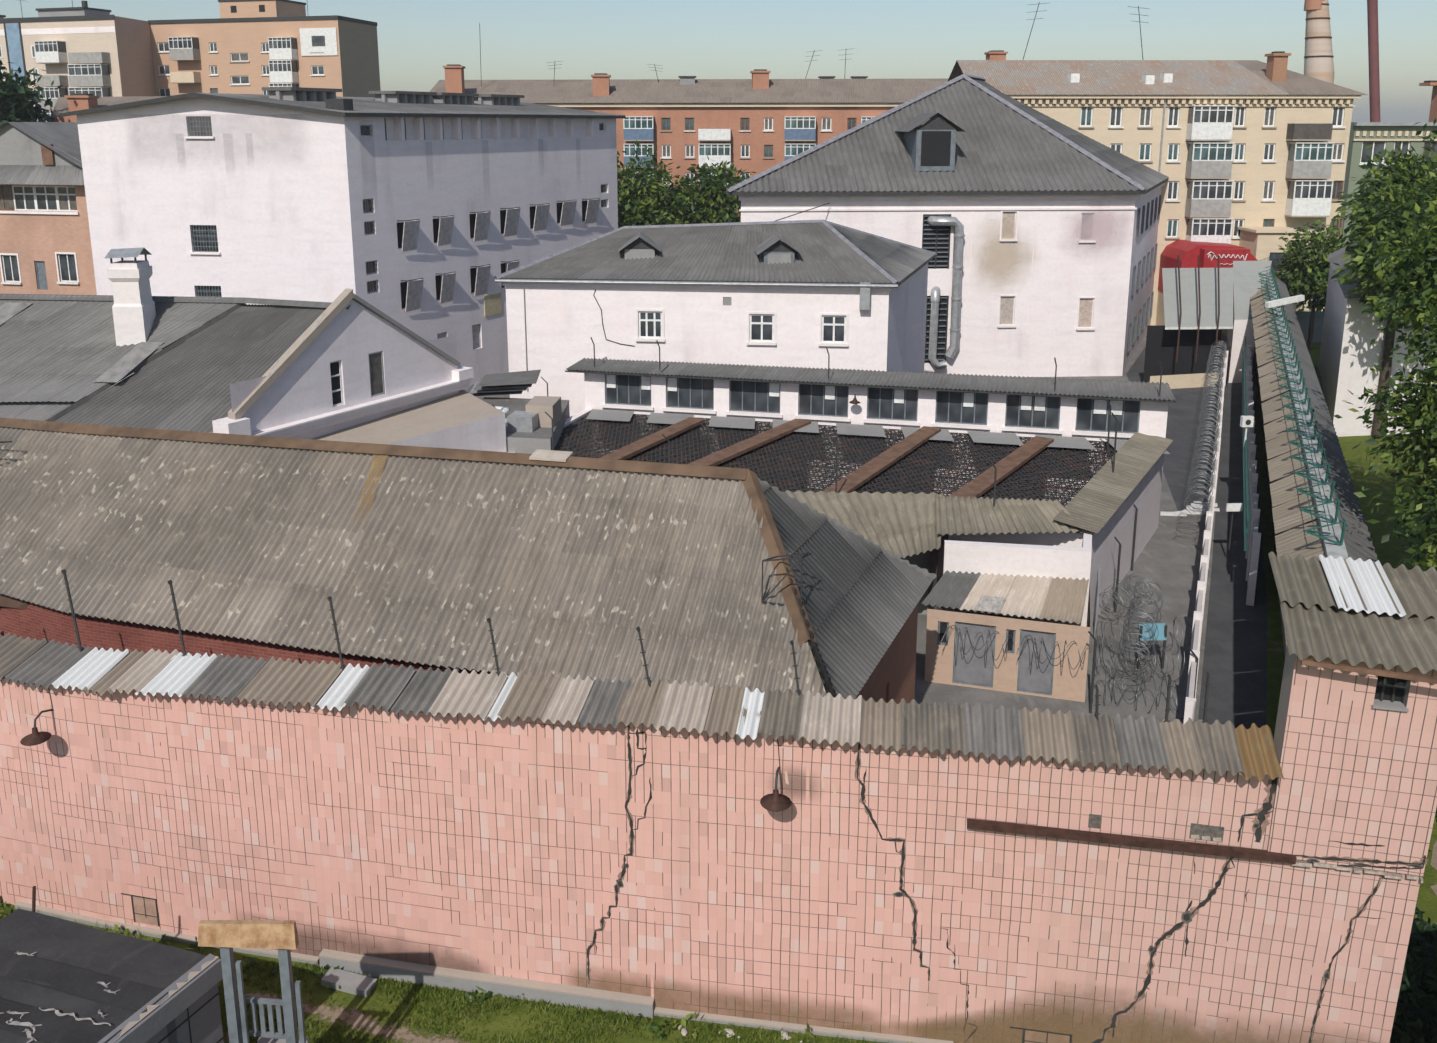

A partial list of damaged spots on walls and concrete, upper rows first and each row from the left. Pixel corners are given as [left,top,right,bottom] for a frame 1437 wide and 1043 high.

crack [586,724,652,984]
crack [855,743,978,1042]
crack [1092,778,1277,1043]
crack [1295,841,1428,1043]